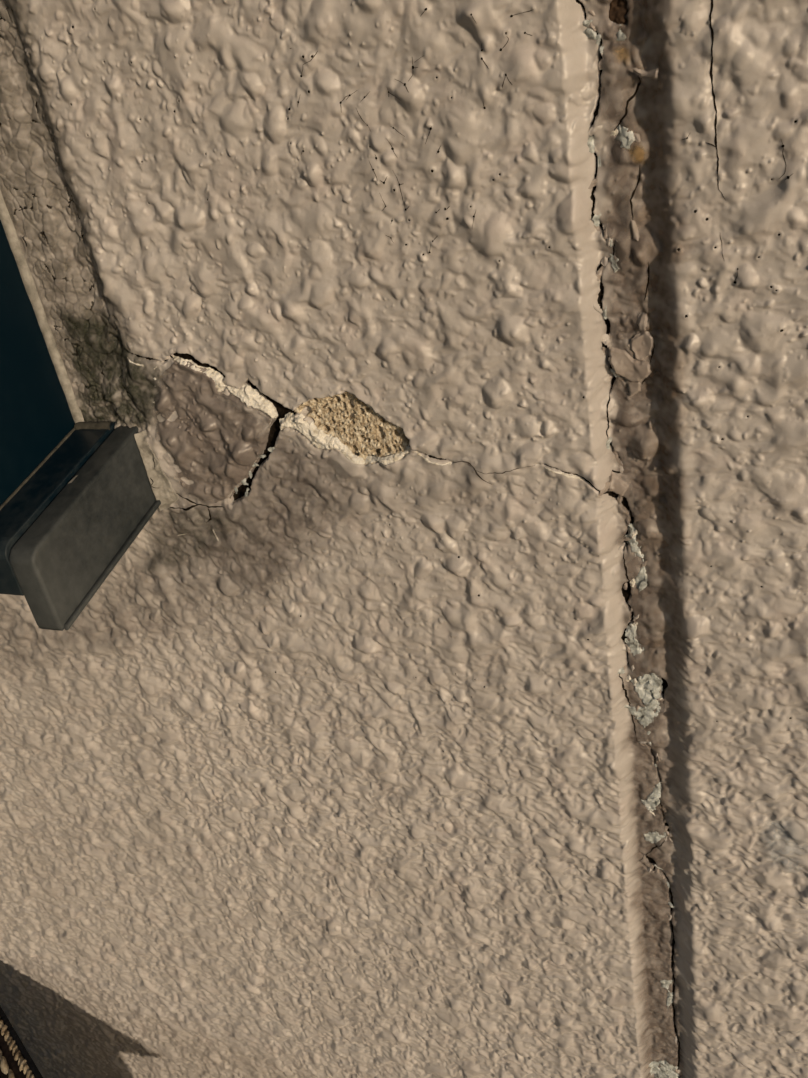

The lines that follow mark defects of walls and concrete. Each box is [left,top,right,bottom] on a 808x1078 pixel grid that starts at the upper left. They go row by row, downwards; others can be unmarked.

crack [340,56,441,242]
leakage [632,51,668,103]
crack [682,0,725,199]
leakage [639,115,680,404]
crack [12,187,336,523]
spalling [294,391,411,465]
crack [409,0,683,1077]
peeling [625,623,644,656]
peeling [622,523,648,592]
peeling [624,673,665,745]
leakage [649,419,680,598]